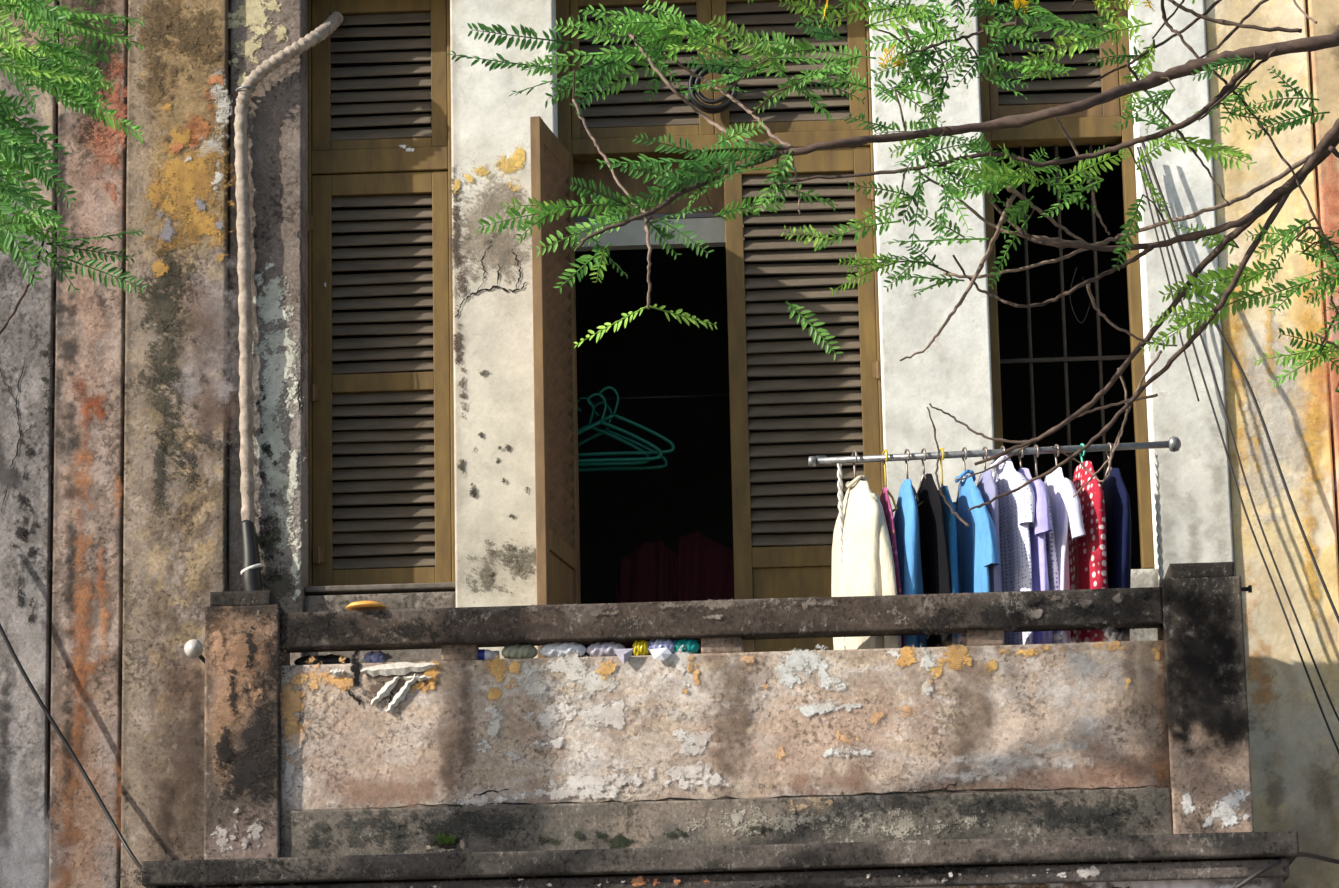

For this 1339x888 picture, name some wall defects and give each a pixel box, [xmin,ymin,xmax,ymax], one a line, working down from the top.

peeling [94,0,288,278]
crack [455,245,526,317]
crack [0,358,36,513]
peeling [251,262,302,601]
leakage [257,494,456,651]
leakage [212,626,258,782]
leakage [115,660,544,888]
peeling [280,650,442,792]
peeling [475,651,633,760]
peeling [443,729,731,806]
peeling [740,645,915,725]
leakage [891,864,998,888]